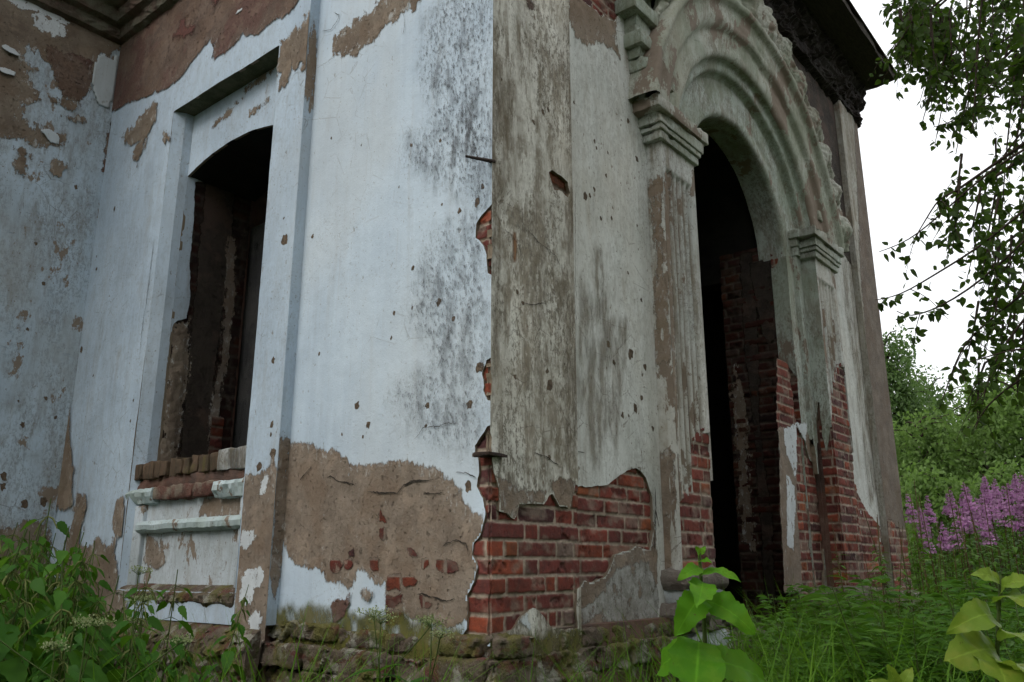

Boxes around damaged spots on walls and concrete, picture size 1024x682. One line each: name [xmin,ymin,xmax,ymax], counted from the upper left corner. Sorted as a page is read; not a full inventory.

flaking render [0,0,318,178]
flaking render [332,0,420,59]
damp [413,0,489,206]
damp [398,219,483,439]
flaking render [199,170,716,658]
flaking render [776,52,913,610]
flaking render [59,493,128,620]